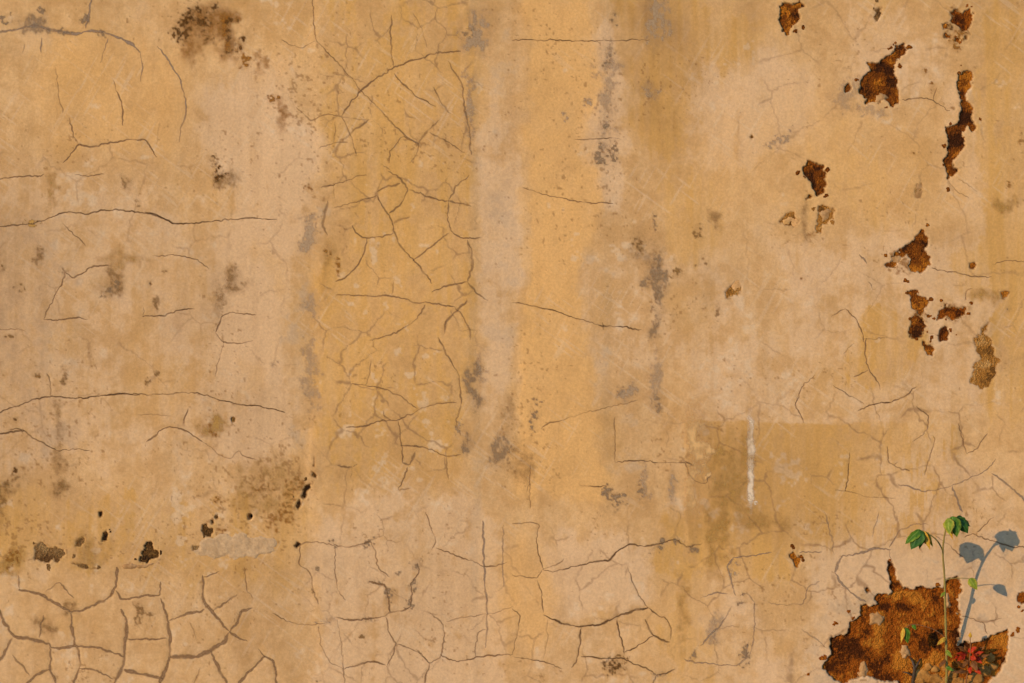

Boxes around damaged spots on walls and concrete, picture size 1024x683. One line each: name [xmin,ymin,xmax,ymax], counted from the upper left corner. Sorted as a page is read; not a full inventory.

crack [312,3,470,149]
spalling [779,0,805,35]
spalling [844,41,913,108]
spalling [942,65,981,192]
crack [0,209,276,232]
crack [327,127,481,365]
spalling [796,161,835,233]
spalling [884,223,973,355]
leakage [668,405,757,508]
crack [0,567,277,683]
crack [322,514,679,682]
spalling [819,559,1020,683]